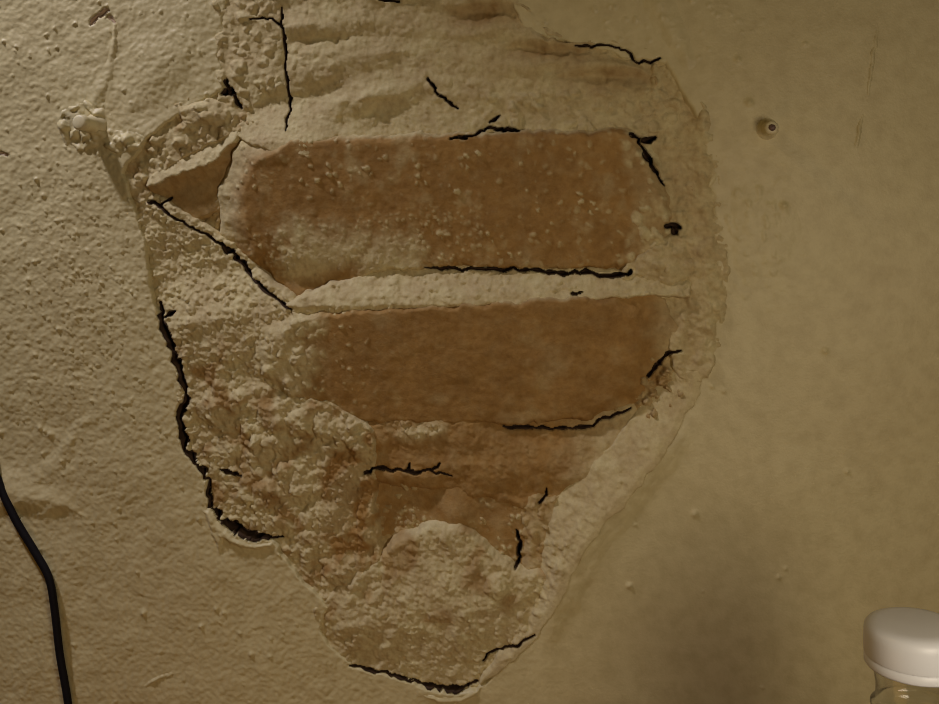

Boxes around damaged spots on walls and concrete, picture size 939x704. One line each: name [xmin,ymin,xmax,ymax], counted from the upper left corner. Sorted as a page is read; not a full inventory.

spalling [90,8,116,26]
crack [249,7,293,131]
crack [575,44,661,64]
crack [427,78,458,109]
crack [450,115,519,140]
crack [147,197,292,310]
crack [425,266,632,295]
spalling [125,0,730,704]
crack [646,350,682,378]
crack [157,301,284,542]
crack [503,407,631,430]
crack [349,634,535,695]